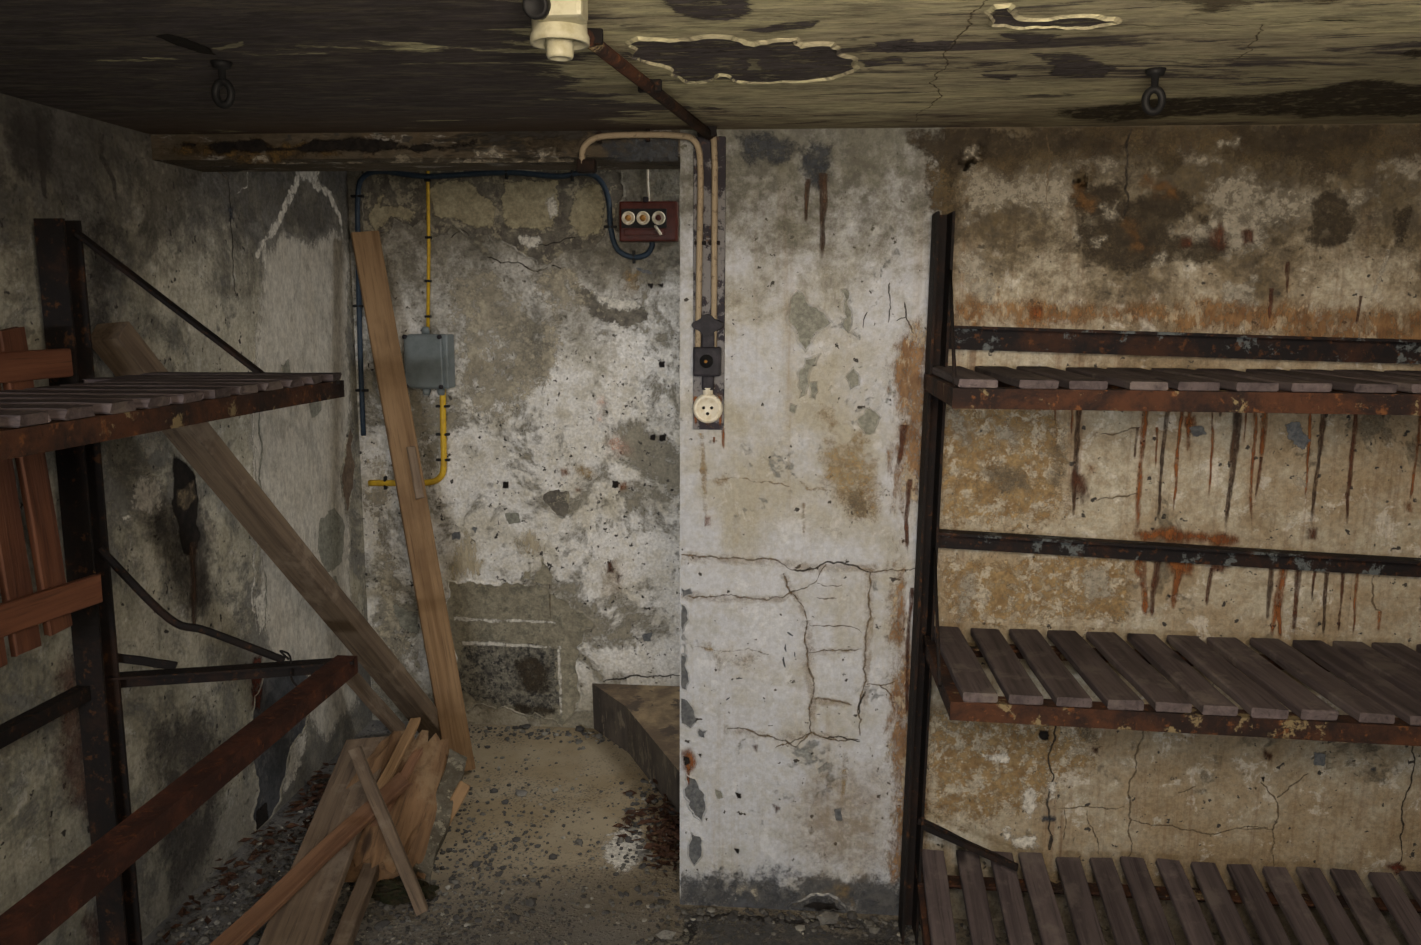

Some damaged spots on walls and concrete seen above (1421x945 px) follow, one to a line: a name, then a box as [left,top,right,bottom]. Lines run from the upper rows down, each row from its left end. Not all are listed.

peeling [625,0,954,84]
crack [916,0,991,121]
crack [1118,19,1392,62]
efflorescence [255,171,343,272]
peeling [334,148,626,268]
leakage [907,79,1421,275]
leakage [123,432,163,520]
rust [887,321,927,546]
rust [1134,411,1268,546]
spalling [445,555,597,727]
crack [681,554,915,748]
rust [885,563,914,882]